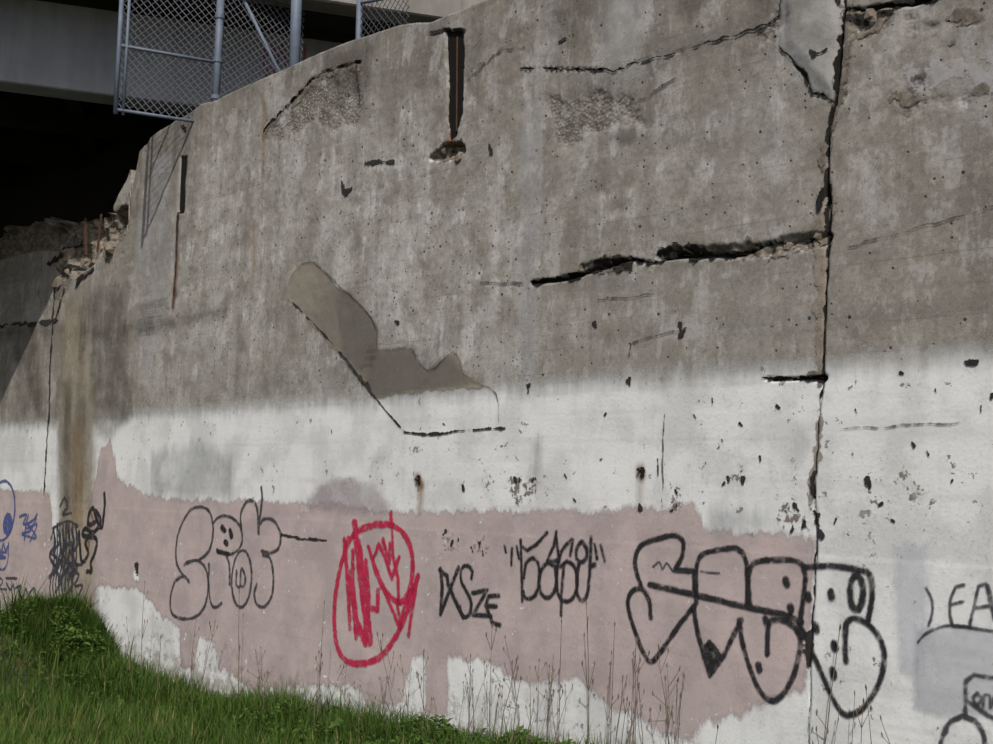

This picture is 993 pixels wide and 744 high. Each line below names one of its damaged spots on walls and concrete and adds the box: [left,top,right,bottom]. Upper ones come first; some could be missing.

crack [262,60,363,140]
rust [447,37,461,149]
spalling [0,204,131,290]
crack [173,212,181,303]
crack [0,288,65,492]
peeling [287,262,483,399]
crack [468,0,993,676]
leakage [64,387,91,593]